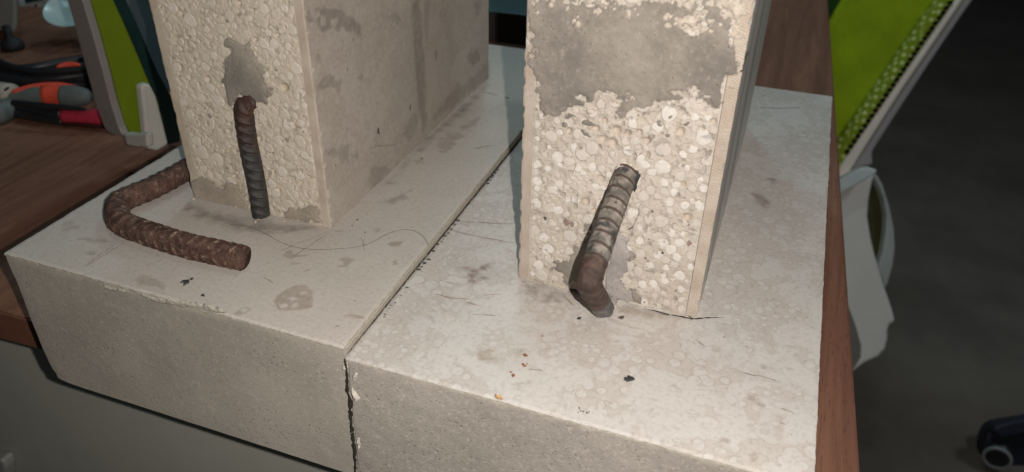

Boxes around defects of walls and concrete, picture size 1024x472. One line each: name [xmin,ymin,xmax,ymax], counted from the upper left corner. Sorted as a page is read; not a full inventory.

peeling [528,0,581,28]
peeling [580,93,604,137]
spalling [615,163,643,192]
crack [345,137,522,472]